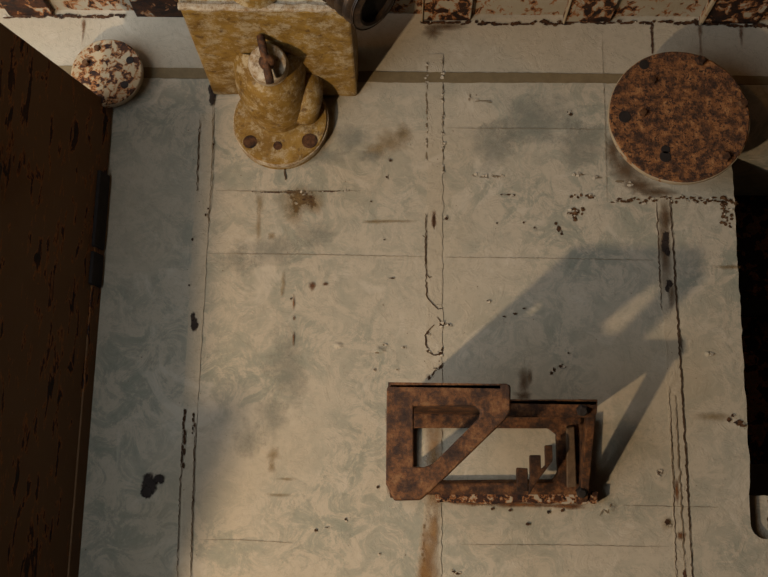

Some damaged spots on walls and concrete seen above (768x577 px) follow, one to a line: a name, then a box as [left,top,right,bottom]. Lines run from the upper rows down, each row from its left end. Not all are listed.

rust [261,190,316,213]
crack [408,215,447,380]
crack [461,202,710,577]
rust [420,519,436,577]